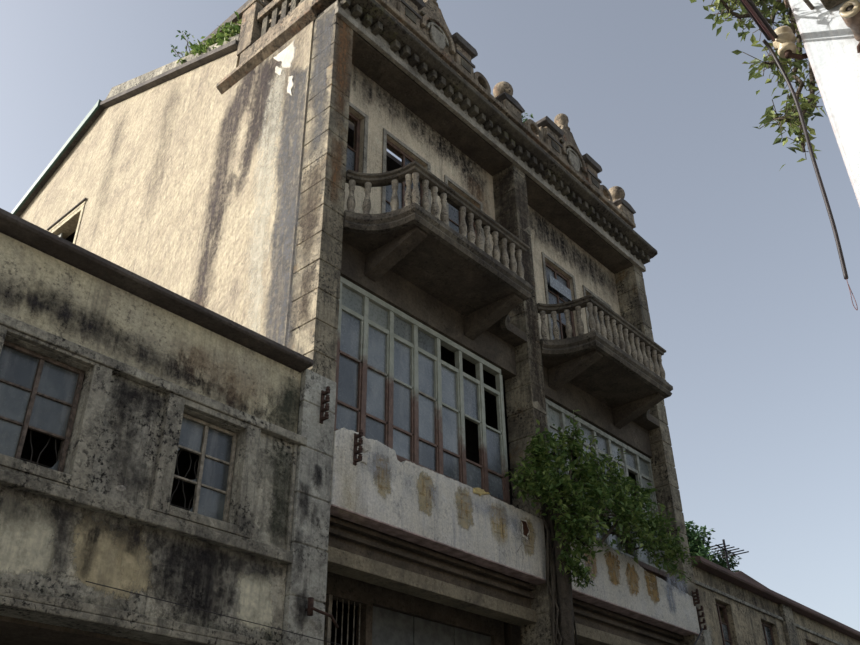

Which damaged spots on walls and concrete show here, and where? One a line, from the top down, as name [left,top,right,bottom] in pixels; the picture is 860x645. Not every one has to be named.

peeling [273,39,296,96]
damp [192,9,335,345]
damp [351,65,616,453]
damp [1,286,301,432]
spalling [360,436,371,465]
damp [0,495,282,614]